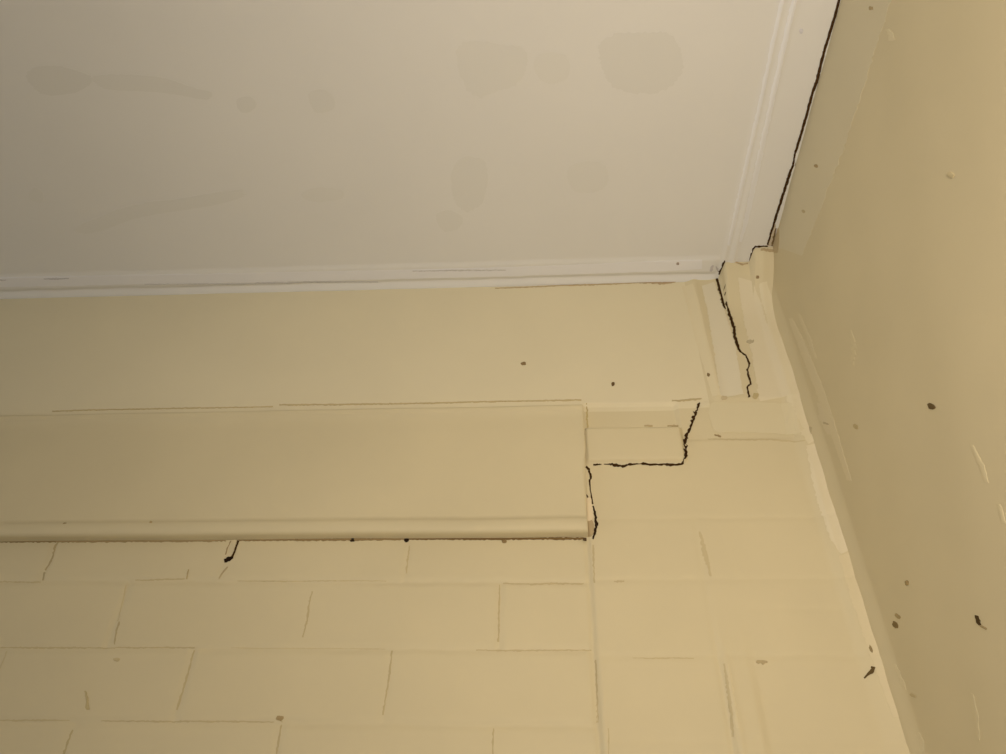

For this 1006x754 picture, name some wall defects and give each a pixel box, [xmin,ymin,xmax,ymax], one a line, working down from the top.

crack [716,0,840,397]
crack [0,398,805,754]